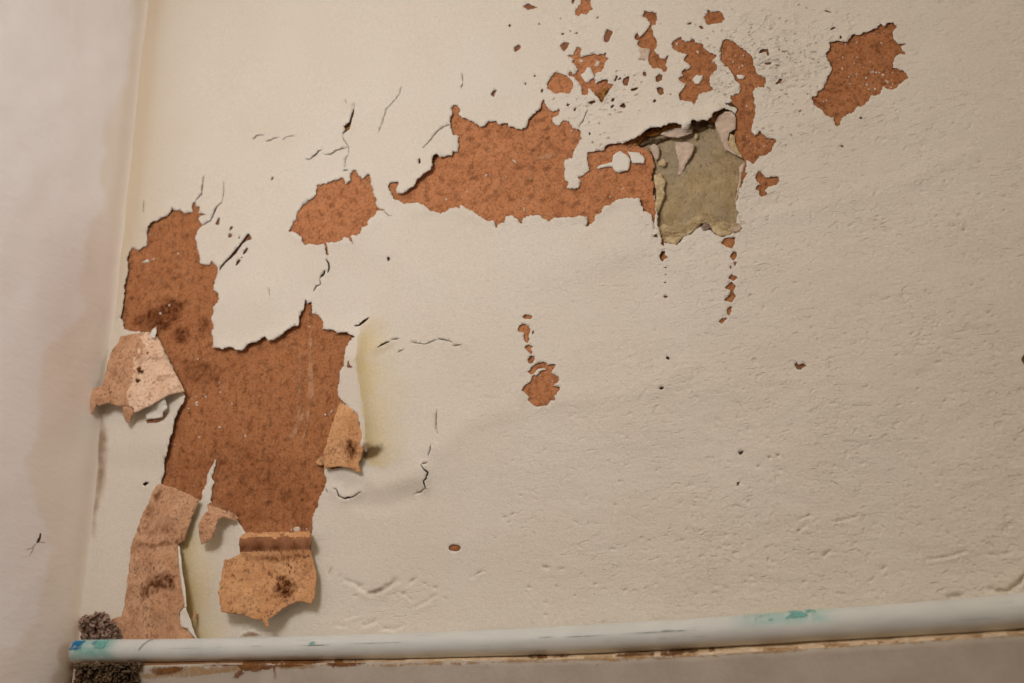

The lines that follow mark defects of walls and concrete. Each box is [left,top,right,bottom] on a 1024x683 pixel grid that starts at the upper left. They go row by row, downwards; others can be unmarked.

crack [307,109,354,171]
peeling [388,10,908,283]
peeling [289,170,391,255]
spalling [518,314,560,407]
peeling [78,178,364,640]
crack [415,413,438,494]